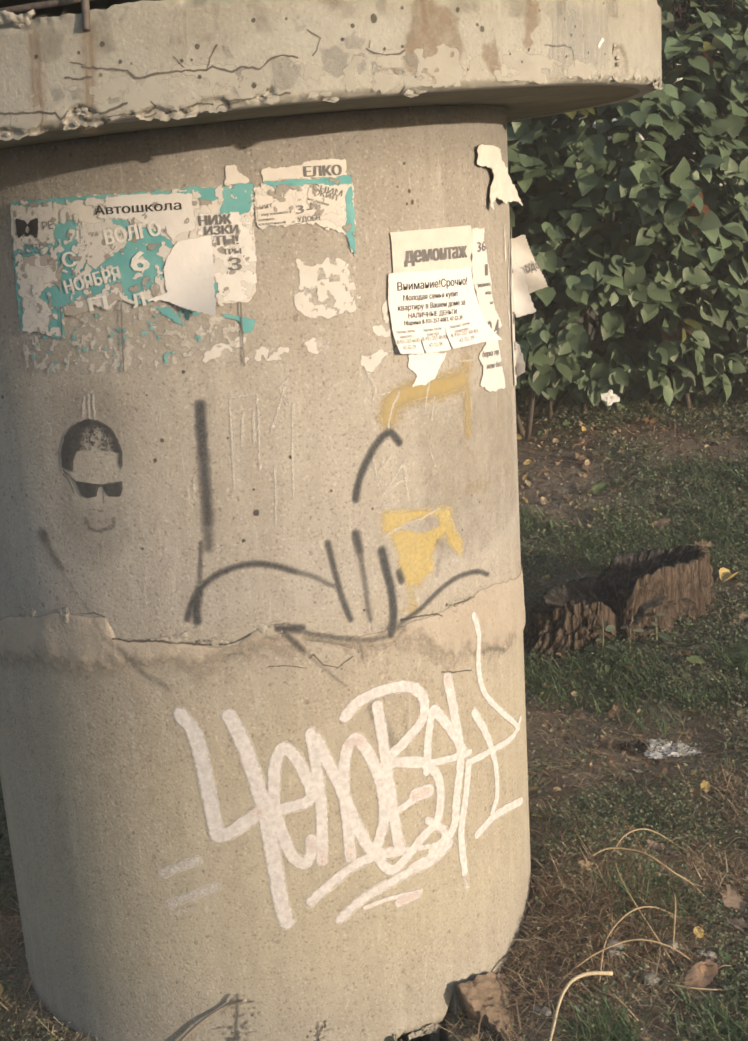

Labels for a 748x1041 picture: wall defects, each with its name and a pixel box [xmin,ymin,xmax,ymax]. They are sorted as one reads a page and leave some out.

crack [0,29,321,129]
peeling [53,44,279,131]
crack [366,43,405,56]
peeling [290,38,663,103]
peeling [0,94,48,141]
crack [82,612,251,646]
crack [268,654,353,668]